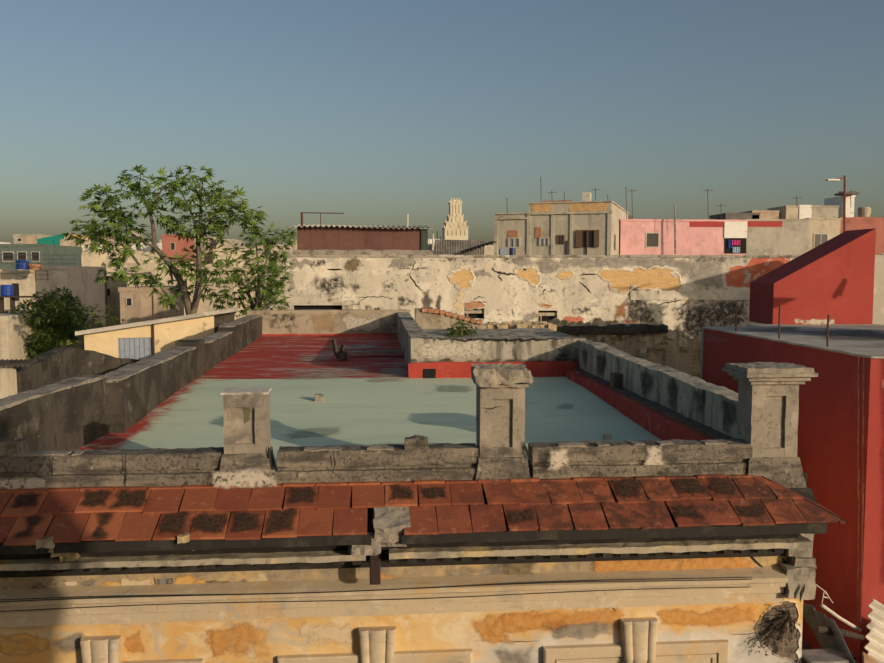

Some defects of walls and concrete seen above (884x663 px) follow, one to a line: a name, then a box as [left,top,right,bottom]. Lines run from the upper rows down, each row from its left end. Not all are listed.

spalling [447,265,477,314]
spalling [513,266,542,288]
spalling [597,266,683,295]
water stain [628,289,654,323]
peeling [725,257,791,288]
water stain [675,300,884,339]
spalling [754,534,817,663]